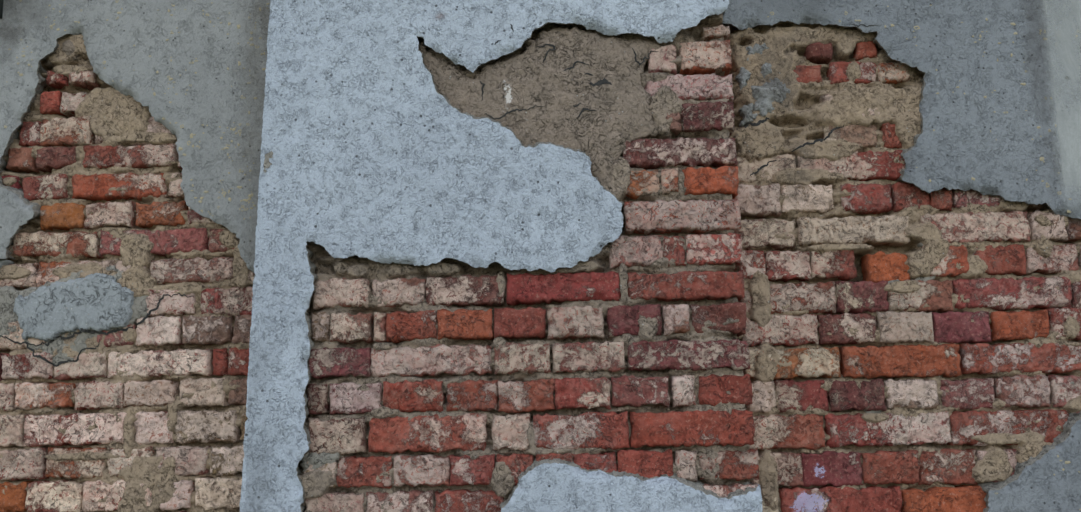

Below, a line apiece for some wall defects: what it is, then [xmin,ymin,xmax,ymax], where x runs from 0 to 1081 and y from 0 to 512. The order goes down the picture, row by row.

spalling [0,34,255,512]
spalling [296,9,1081,512]